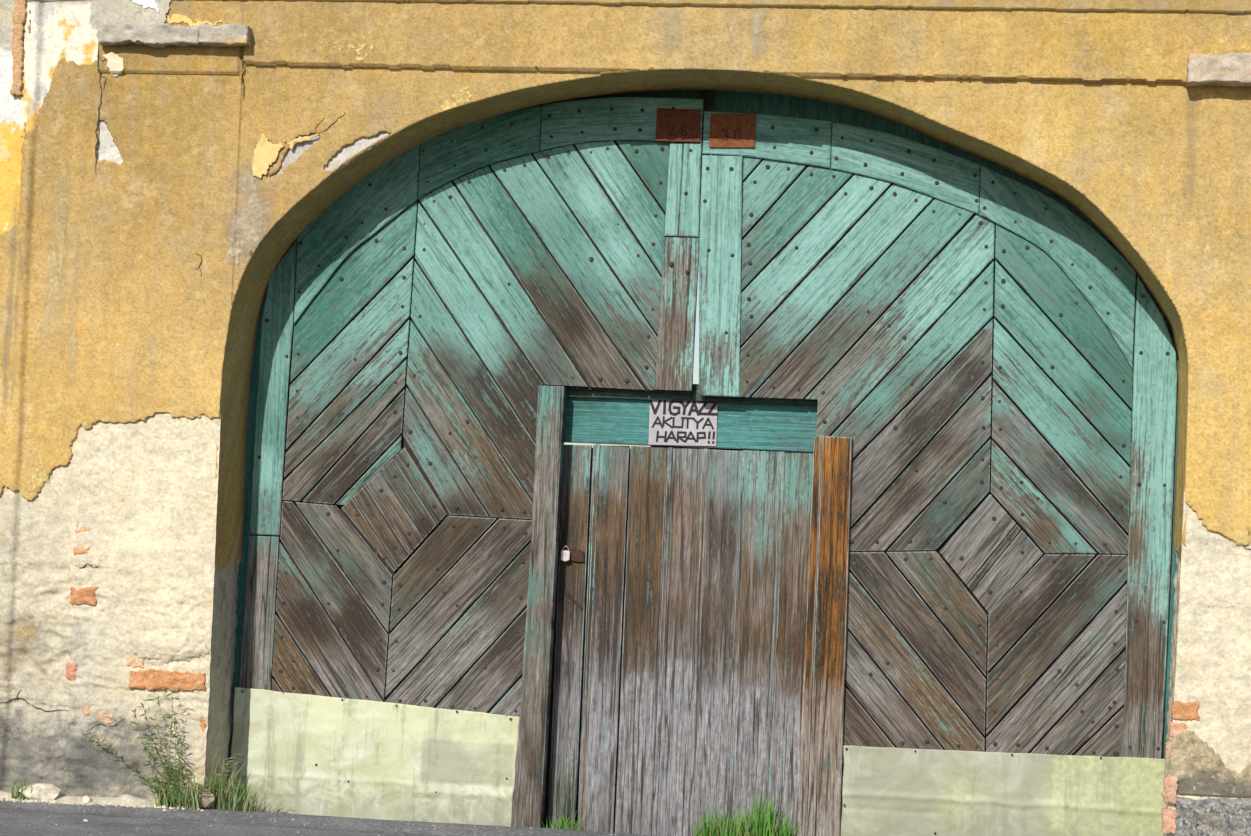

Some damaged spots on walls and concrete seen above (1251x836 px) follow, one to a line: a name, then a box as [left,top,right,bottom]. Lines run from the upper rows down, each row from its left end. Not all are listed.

peeling [0,0,222,234]
flaking render [252,133,320,179]
flaking render [324,132,397,177]
flaking render [0,412,221,809]
flaking render [1161,492,1251,836]
crack [0,690,122,731]
damp [1170,730,1251,798]